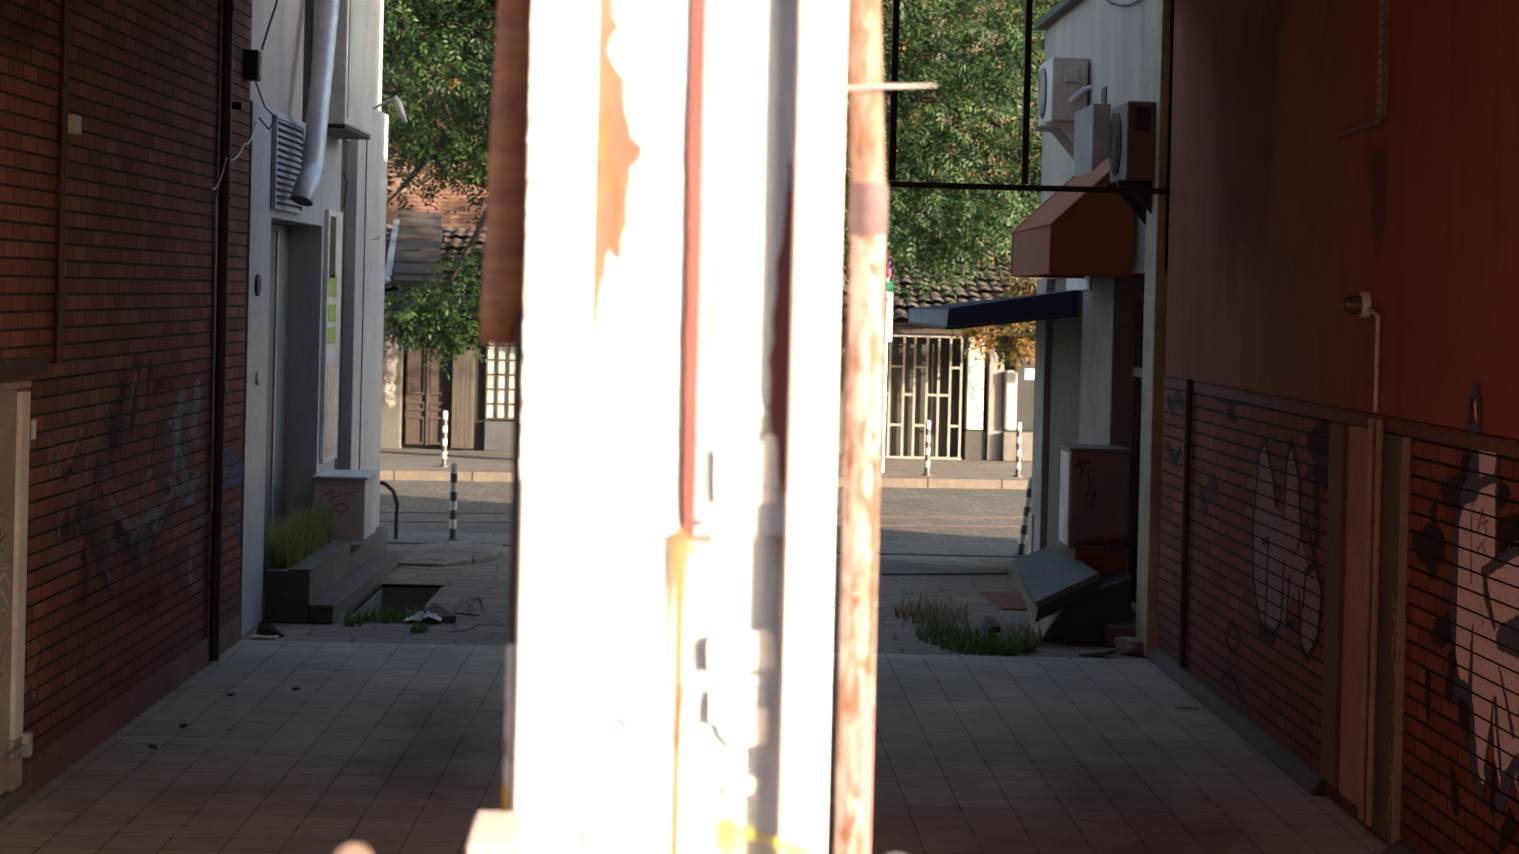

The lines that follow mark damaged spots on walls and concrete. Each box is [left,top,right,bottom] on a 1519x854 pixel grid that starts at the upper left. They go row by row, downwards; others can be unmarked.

corrosion [586,0,785,854]
corrosion [769,161,793,494]
corrosion [846,247,868,526]
corrosion [866,426,879,675]